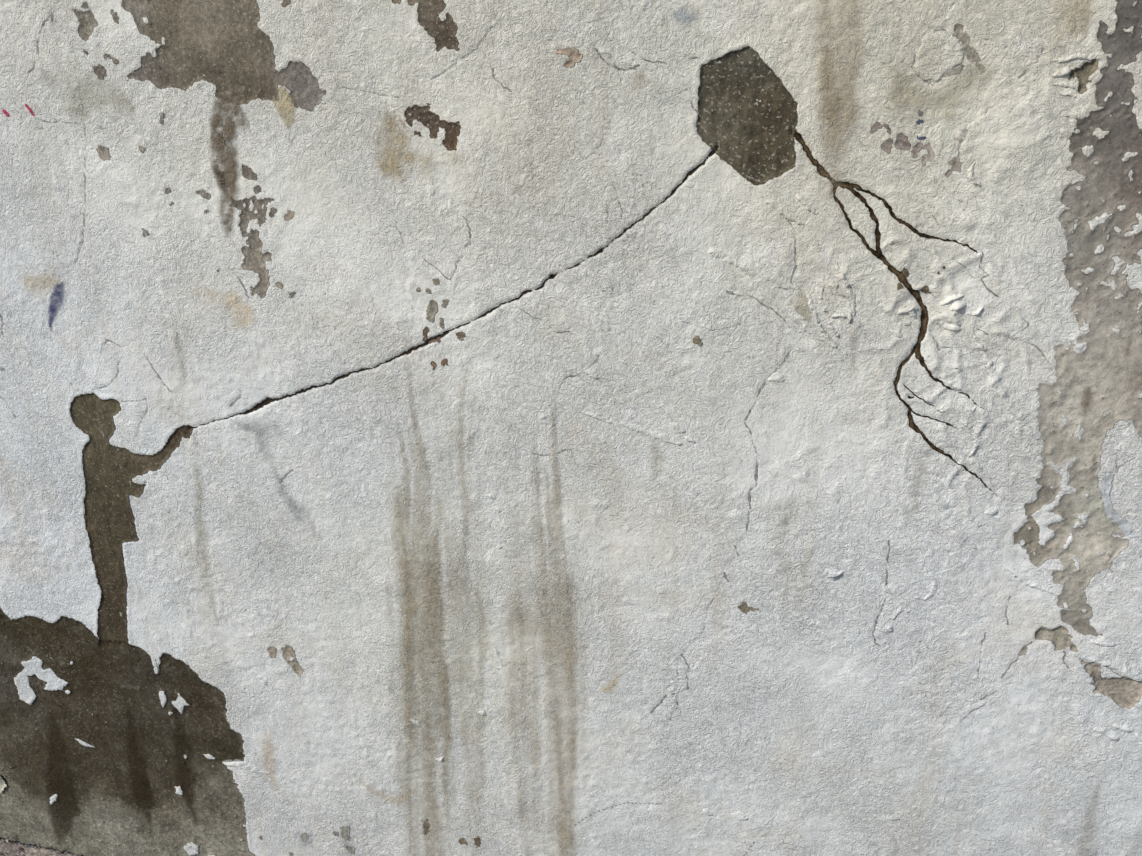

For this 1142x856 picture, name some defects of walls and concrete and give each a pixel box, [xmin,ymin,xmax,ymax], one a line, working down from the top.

spalling [72,1,118,80]
peeling [110,0,326,111]
peeling [392,0,459,52]
peeling [404,103,460,151]
peeling [230,164,295,298]
crack [91,150,716,432]
crack [791,129,1051,491]
peeling [1013,0,1142,709]
peeling [0,392,270,856]
spalling [267,645,304,677]
spalling [333,824,355,854]